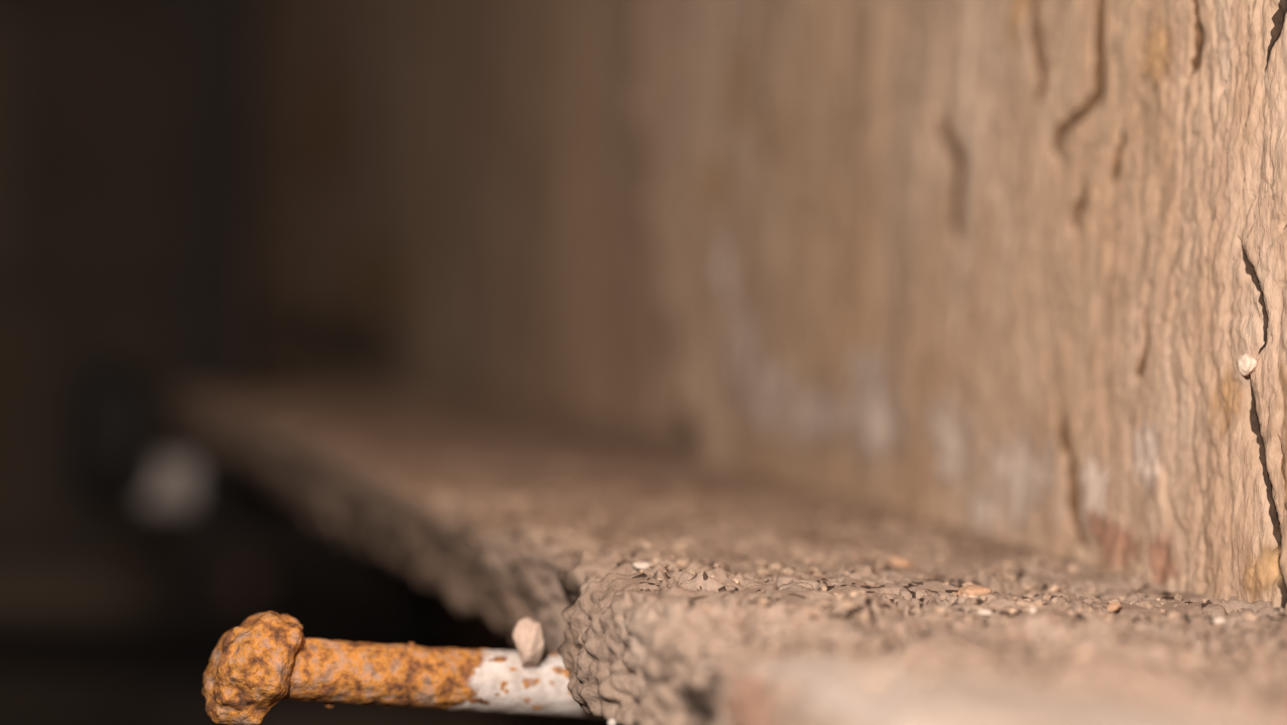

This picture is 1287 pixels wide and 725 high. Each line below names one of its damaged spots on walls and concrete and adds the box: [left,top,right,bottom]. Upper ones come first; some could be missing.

crack [1028,0,1106,162]
crack [1264,0,1287,72]
crack [1071,129,1125,230]
crack [1136,307,1149,379]
crack [1238,236,1287,609]